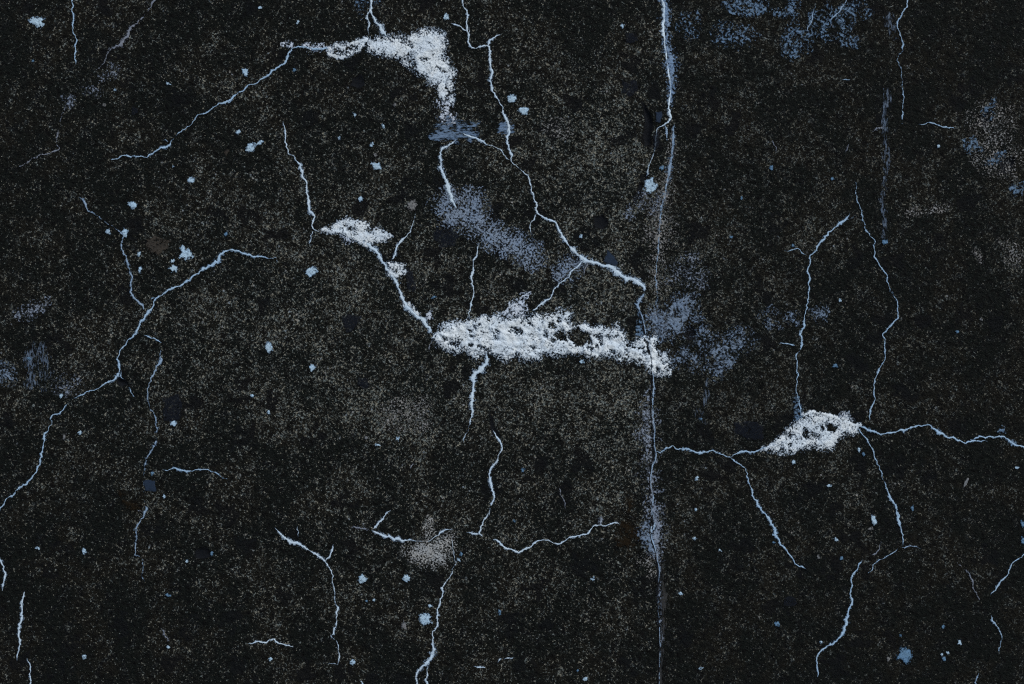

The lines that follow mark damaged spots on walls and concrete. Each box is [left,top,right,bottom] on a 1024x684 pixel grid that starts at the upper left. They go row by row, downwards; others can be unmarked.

damp [280,26,480,144]
crack [0,197,278,580]
damp [321,215,394,248]
crack [357,214,432,349]
damp [386,261,407,279]
damp [403,253,800,424]
crack [437,0,806,684]
damp [760,396,862,456]
crack [782,186,1024,677]
crack [352,352,619,684]
crack [0,559,32,684]
crack [275,526,340,665]